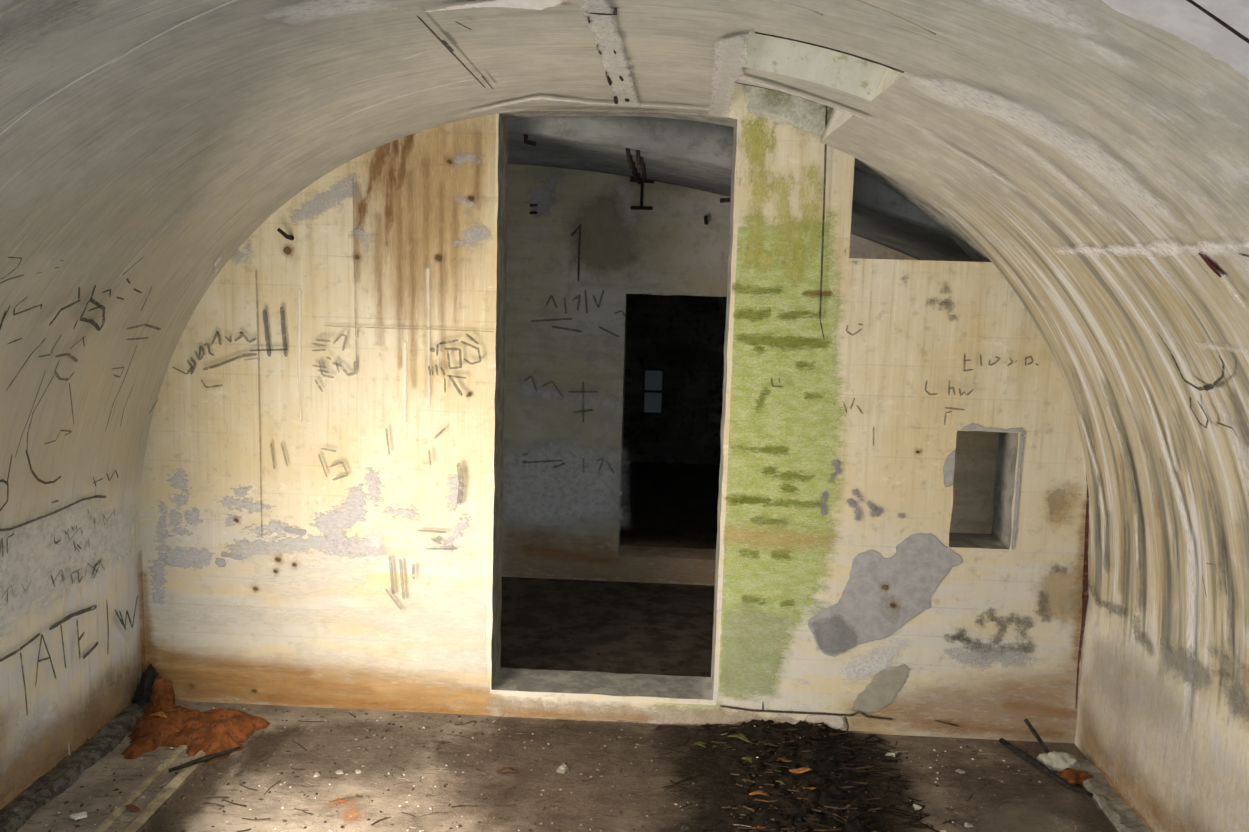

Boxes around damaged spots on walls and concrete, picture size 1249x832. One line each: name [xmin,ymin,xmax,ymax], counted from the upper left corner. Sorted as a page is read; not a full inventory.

crack [416,15,493,89]
peeling [424,0,569,12]
spalling [1101,0,1249,80]
corrosion [359,134,413,222]
water stain [730,85,834,297]
water stain [734,309,829,368]
water stain [0,513,130,630]
peeling [148,468,418,604]
peeling [808,533,962,657]
water stain [945,378,1249,729]
corrosion [0,564,493,810]
peeling [776,664,910,729]